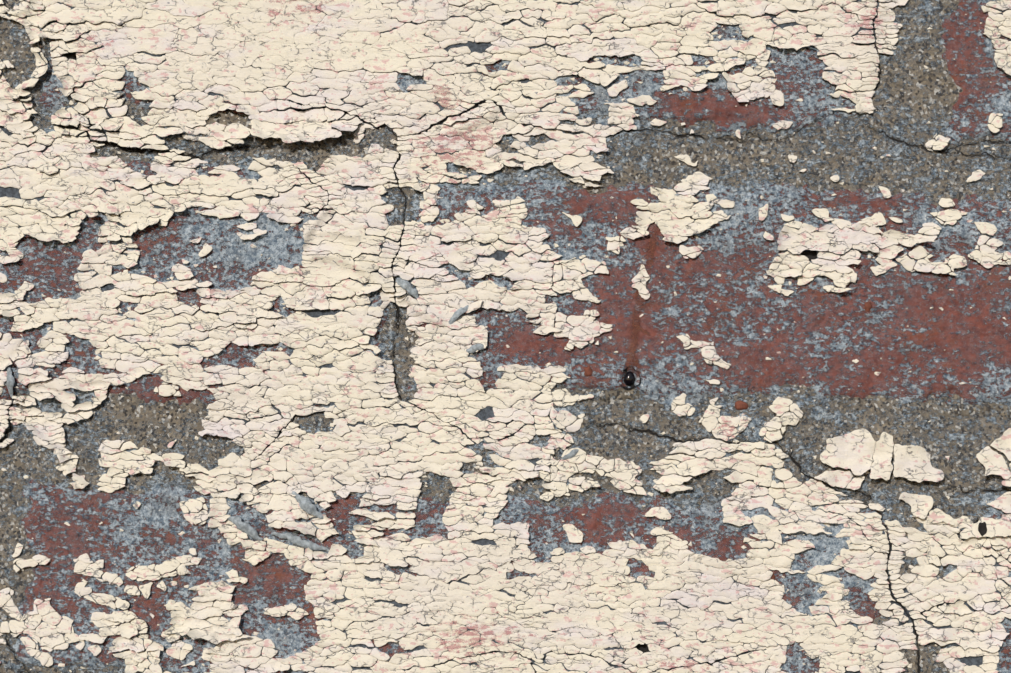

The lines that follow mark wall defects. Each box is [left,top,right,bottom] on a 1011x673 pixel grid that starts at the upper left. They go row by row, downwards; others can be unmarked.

peeling [0,0,402,185]
crack [612,110,834,143]
crack [870,128,1011,161]
crack [259,100,521,455]
peeling [359,0,1011,628]
crack [0,391,14,443]
peeling [0,200,503,673]
crack [585,423,942,673]
peeling [900,628,966,673]
peeling [986,611,1011,673]